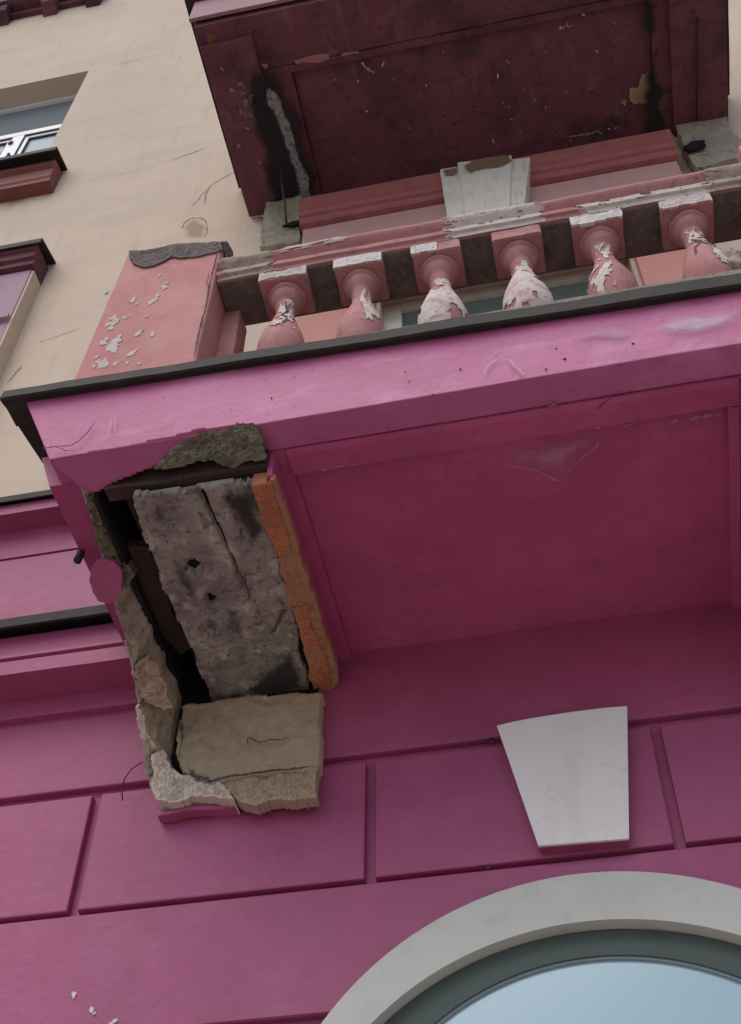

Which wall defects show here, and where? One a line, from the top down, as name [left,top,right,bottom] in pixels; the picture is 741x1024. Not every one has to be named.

water stain [239,73,315,201]
spalling [92,217,348,369]
peeling [333,252,382,270]
peeling [360,289,384,330]
peeling [418,278,468,324]
peeling [410,201,546,257]
peeling [502,260,554,310]
peeling [587,243,616,293]
spalling [684,227,741,270]
crack [42,420,96,451]
spalling [52,422,339,824]
crack [210,766,314,782]